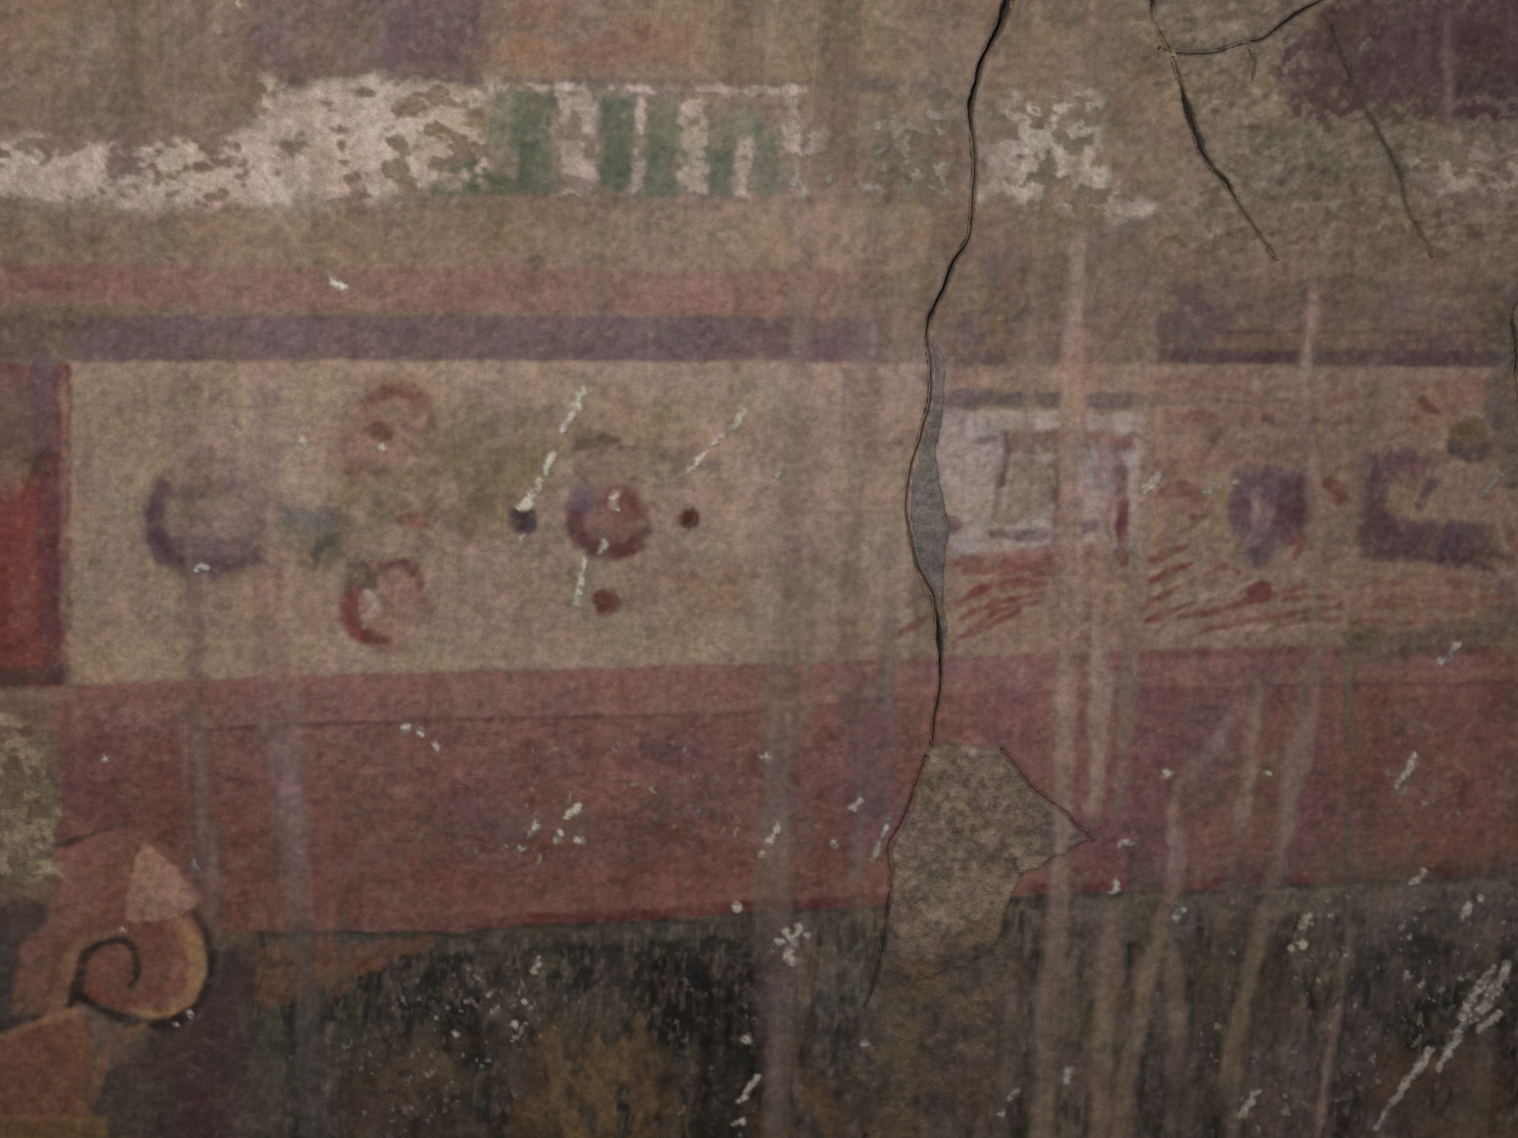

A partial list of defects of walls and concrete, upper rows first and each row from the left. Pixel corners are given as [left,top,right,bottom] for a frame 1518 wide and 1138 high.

peeling [0,74,833,216]
peeling [855,107,958,202]
peeling [978,89,1159,228]
crack [1148,0,1435,260]
leakage [1300,291,1321,503]
crack [864,0,1016,1008]
leakage [1030,234,1146,1138]
peeling [0,714,63,884]
crack [1002,749,1095,843]
leakage [1090,688,1267,1138]
leakage [1315,960,1344,1138]